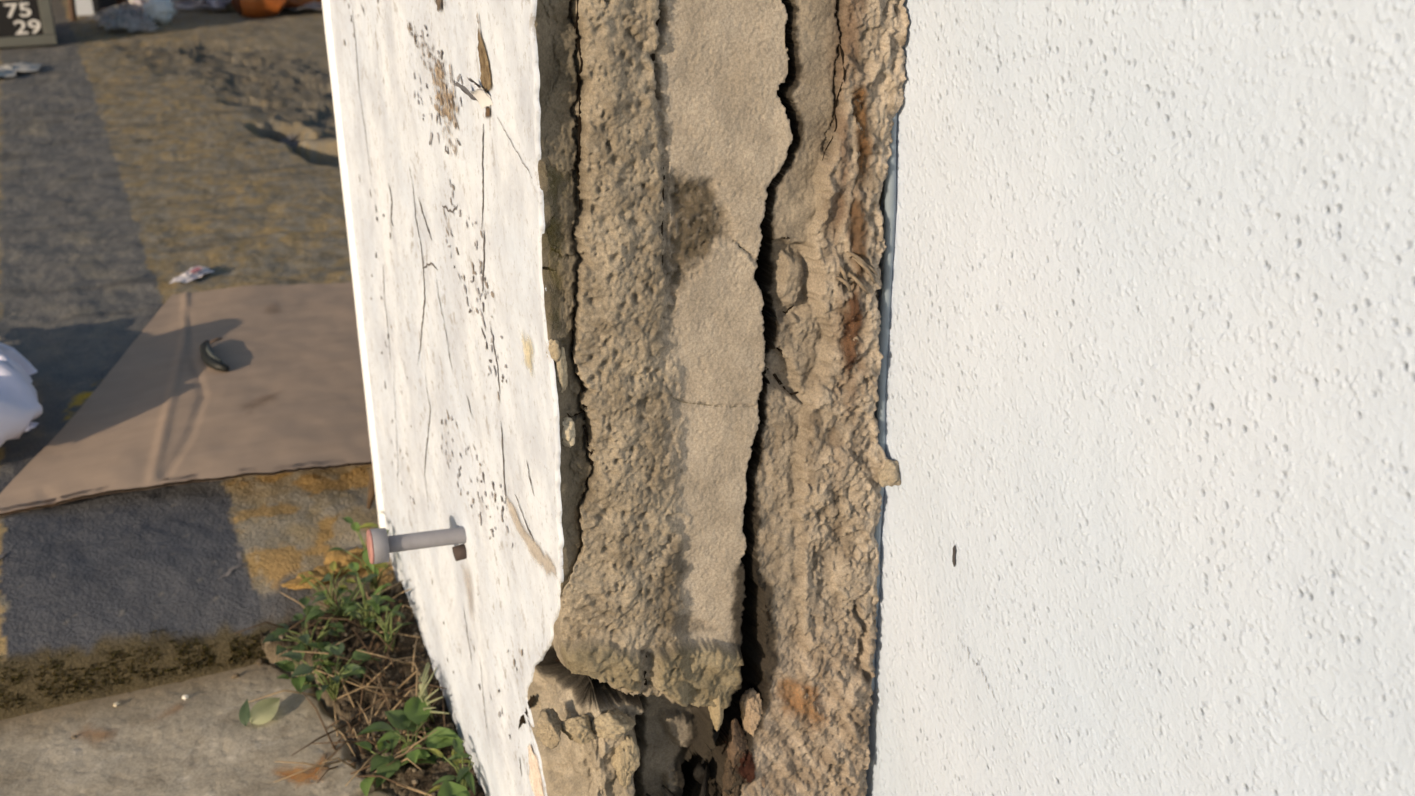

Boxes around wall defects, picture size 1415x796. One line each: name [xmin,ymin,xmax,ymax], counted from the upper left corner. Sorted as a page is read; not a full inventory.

flaking render [407,14,493,154]
crack [574,0,583,209]
corrosion [854,88,872,174]
crack [350,0,534,541]
crack [542,266,593,495]
water stain [675,183,713,255]
spalling [507,0,910,796]
crack [666,0,846,626]
corrosion [843,294,863,374]
corrosion [850,204,865,274]
crack [463,609,535,771]
crack [728,661,758,728]